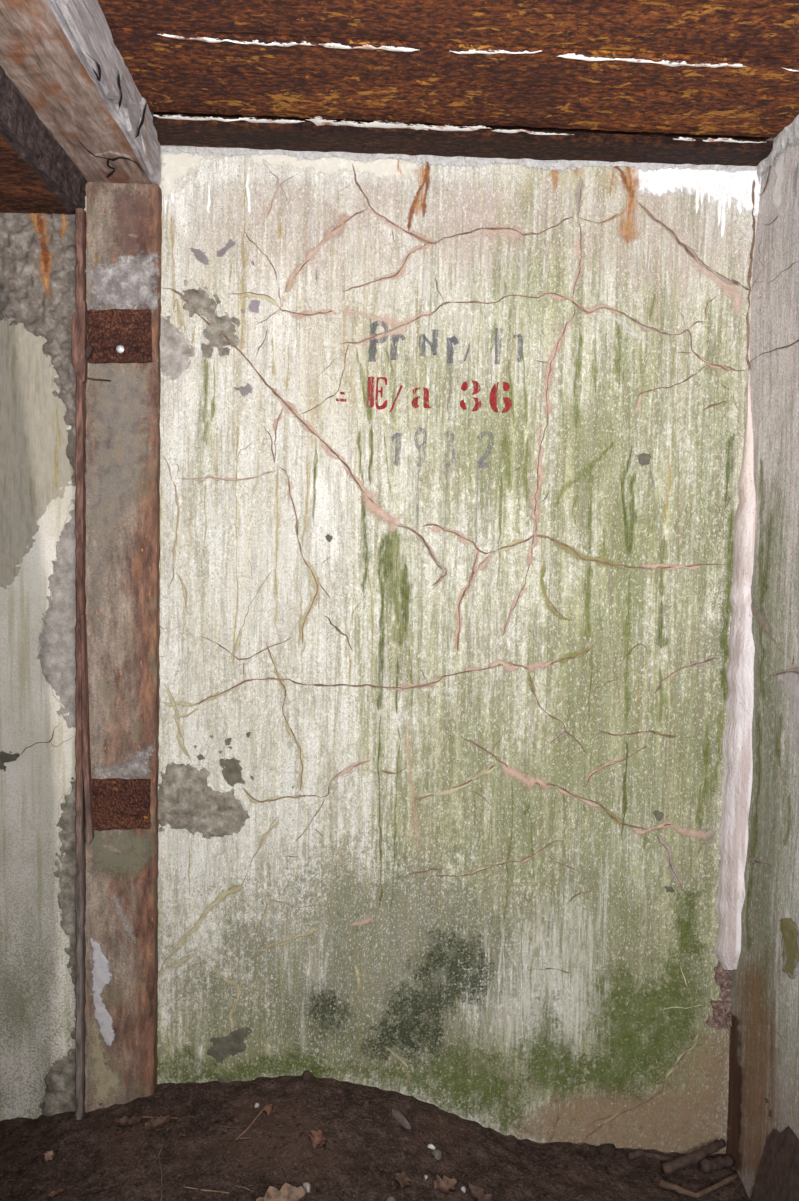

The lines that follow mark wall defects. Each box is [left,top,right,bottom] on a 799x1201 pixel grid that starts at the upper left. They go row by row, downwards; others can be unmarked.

corrosion [407,162,430,229]
corrosion [603,166,638,244]
leakage [630,149,798,238]
peeling [160,280,260,380]
peeling [0,213,76,728]
leakage [302,459,318,542]
crack [158,162,799,1030]
spalling [0,751,20,772]
peeling [158,736,254,839]
peeling [207,1027,252,1083]
leakage [158,1049,319,1083]
leakage [361,893,772,1169]